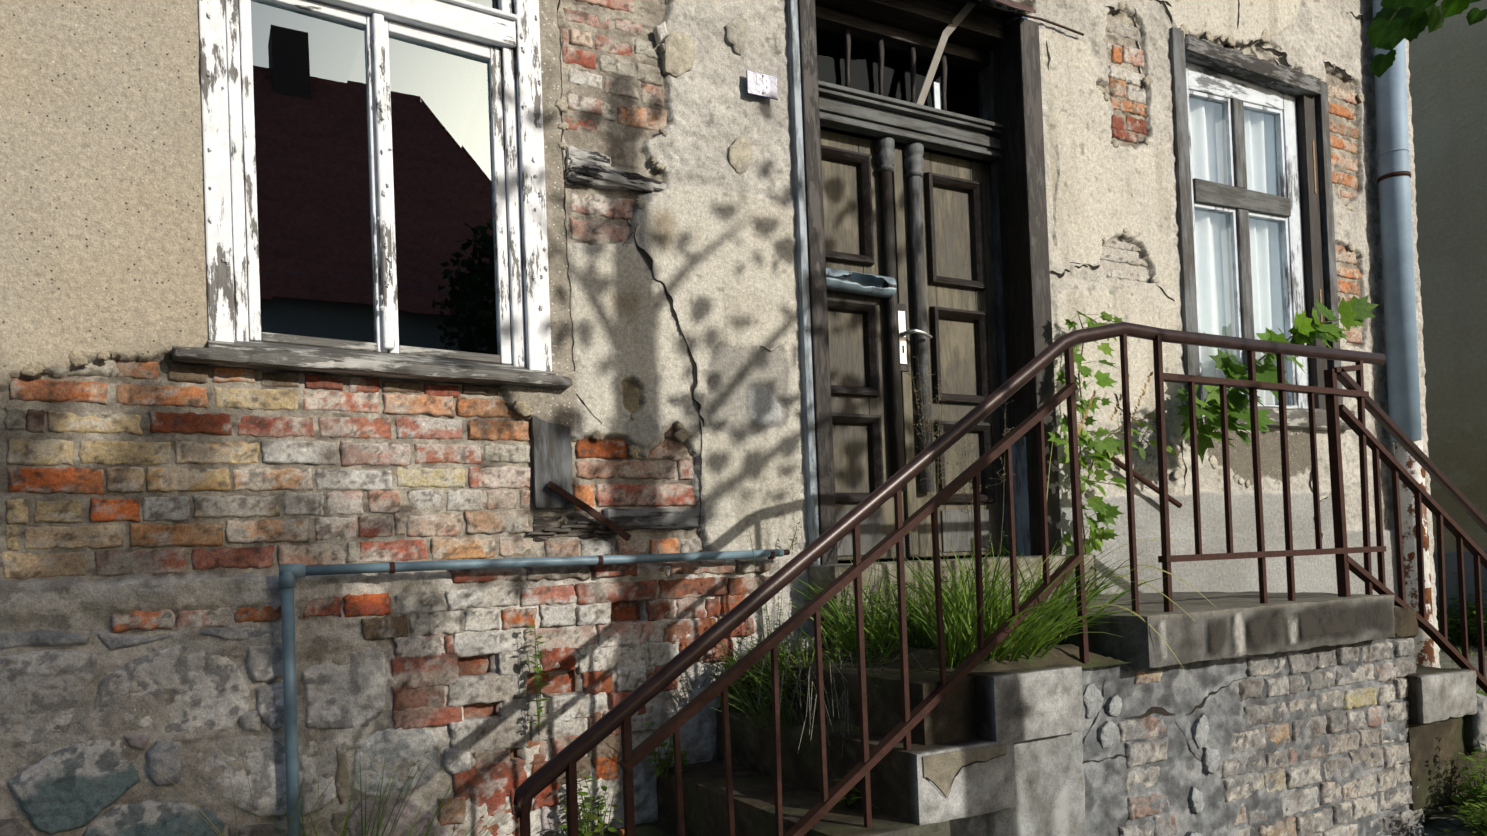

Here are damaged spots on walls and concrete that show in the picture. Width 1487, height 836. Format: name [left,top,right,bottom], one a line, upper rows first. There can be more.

flaking render [539,0,667,150]
flaking render [1103,1,1153,148]
crack [1105,0,1174,109]
flaking render [1327,64,1365,211]
flaking render [569,191,646,244]
crack [1050,144,1100,278]
flaking render [1100,228,1160,283]
flaking render [1335,242,1365,307]
crack [623,219,707,535]
flaking render [2,349,771,836]
corrosion [1408,523,1429,561]
corrosion [1417,574,1433,628]